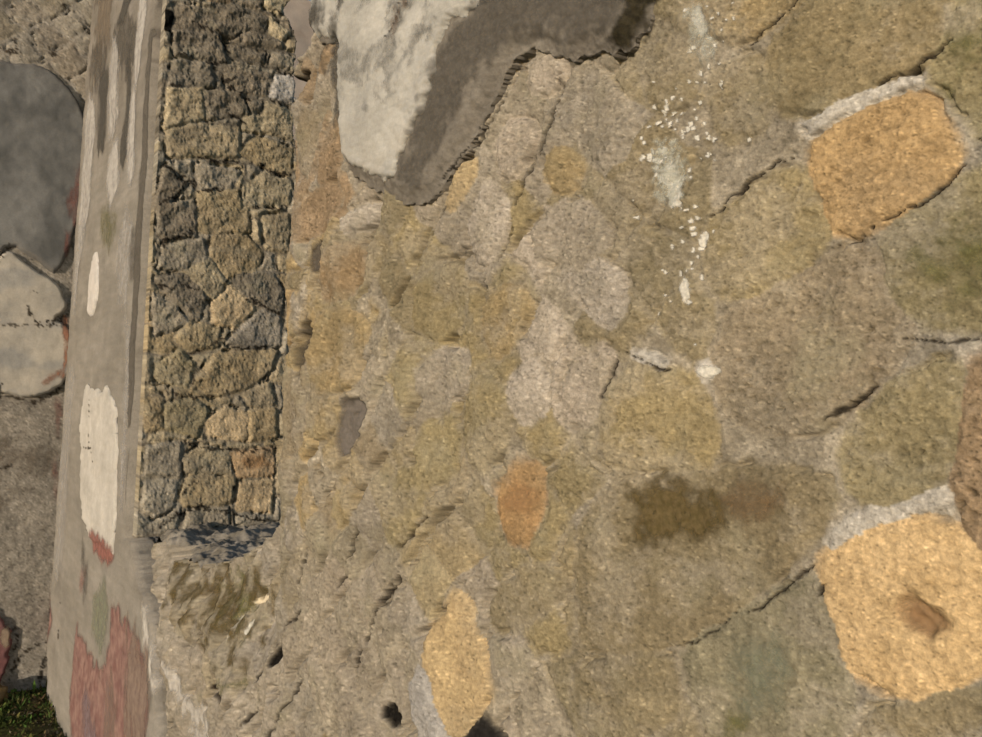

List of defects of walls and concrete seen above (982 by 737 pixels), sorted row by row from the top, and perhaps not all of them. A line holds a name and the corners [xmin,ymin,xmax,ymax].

water stain [683,5,735,83]
crack [752,0,798,45]
peeling [309,0,655,206]
water stain [640,88,717,304]
water stain [697,366,721,378]